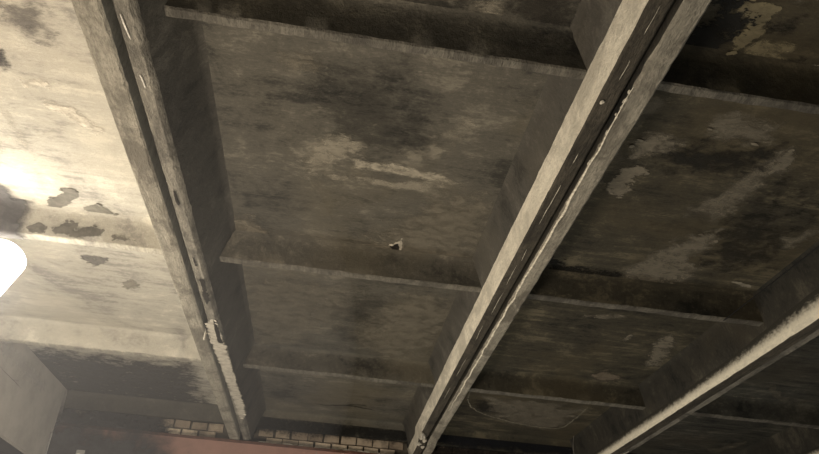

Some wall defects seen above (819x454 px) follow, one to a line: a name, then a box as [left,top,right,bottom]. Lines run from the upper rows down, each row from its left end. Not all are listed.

flaking render [726,0,795,60]
water stain [331,159,457,191]
peeling [47,188,79,208]
peeling [83,203,119,216]
peeling [26,220,135,241]
peeling [80,255,108,266]
peeling [122,279,140,290]